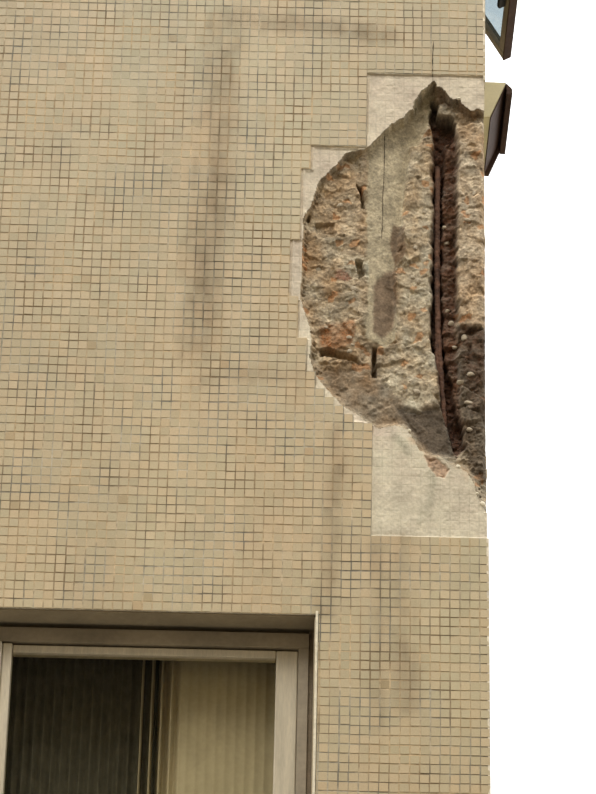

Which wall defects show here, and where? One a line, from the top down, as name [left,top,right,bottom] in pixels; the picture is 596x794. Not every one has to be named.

spalling [289,74,487,538]